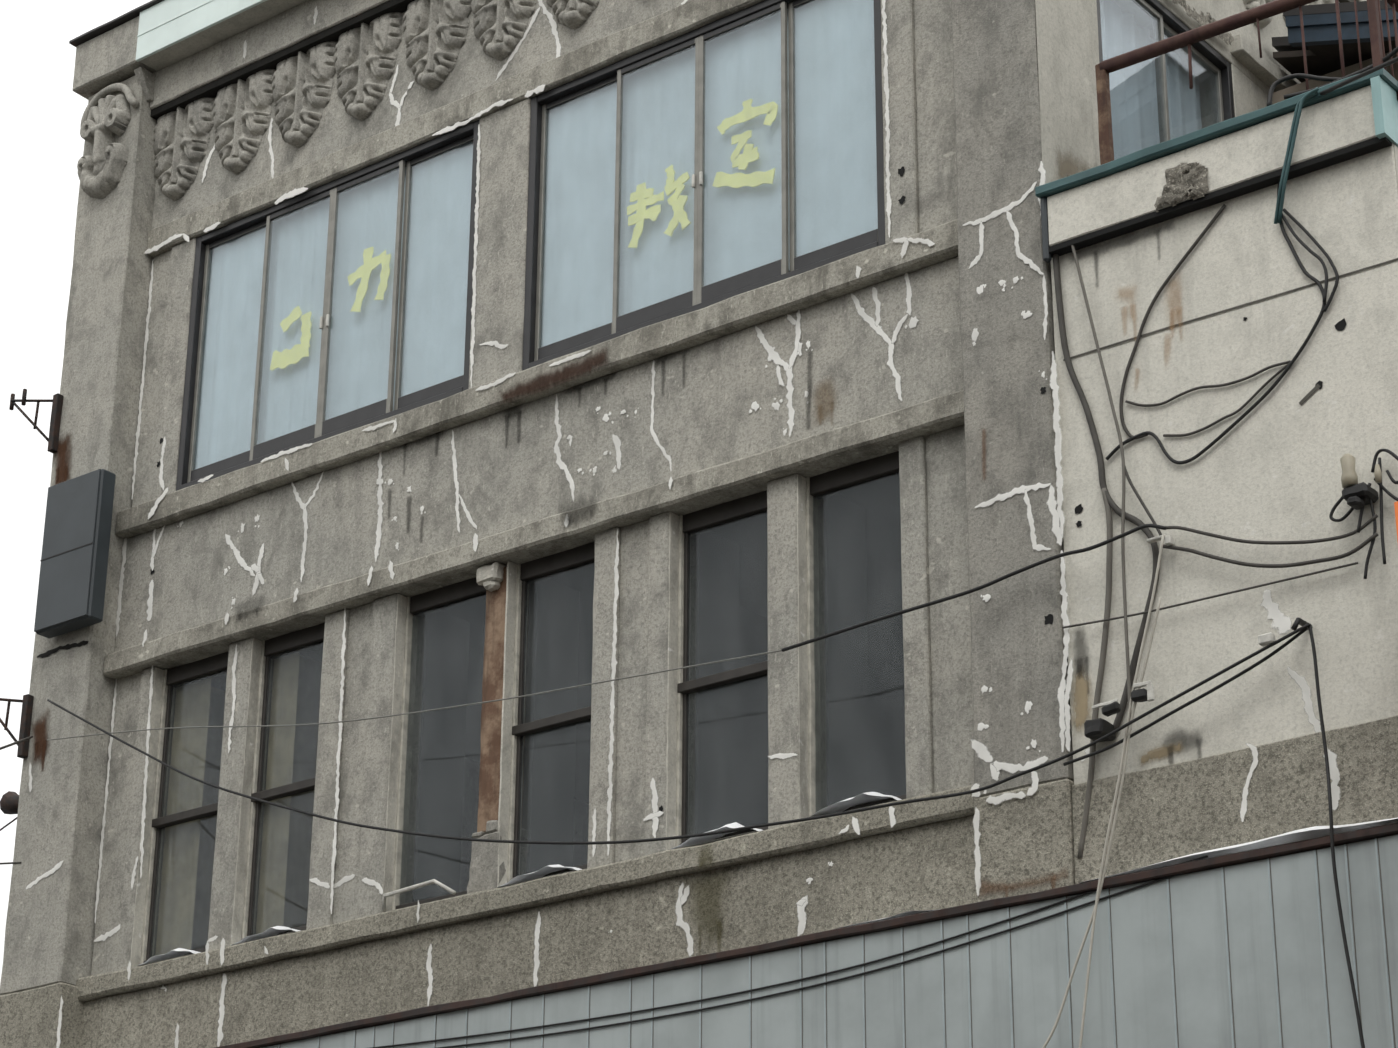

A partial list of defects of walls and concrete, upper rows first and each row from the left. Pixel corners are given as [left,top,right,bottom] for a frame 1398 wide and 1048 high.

rust [55,436,70,484]
crack [362,419,397,585]
crack [451,430,478,552]
crack [475,341,516,391]
rust [502,350,607,401]
crack [549,350,591,527]
crack [612,360,673,489]
crack [755,309,801,437]
rust [33,716,48,770]
crack [971,482,1074,895]
crack [675,882,693,957]